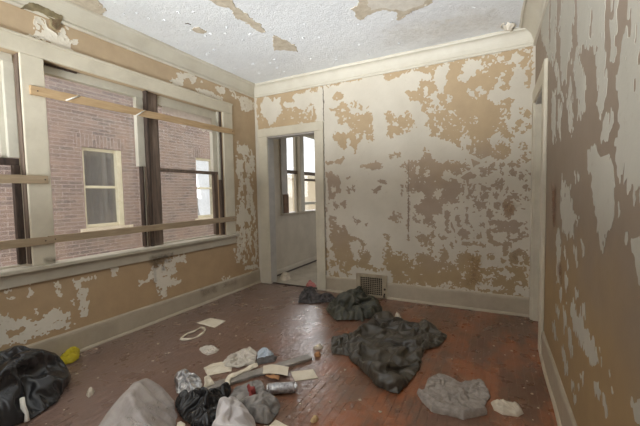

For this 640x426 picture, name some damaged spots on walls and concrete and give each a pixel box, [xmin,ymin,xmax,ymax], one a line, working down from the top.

peeling [20,2,78,51]
spalling [210,0,265,35]
spalling [272,35,298,52]
spalling [351,0,433,25]
peeling [541,0,640,254]
peeling [169,46,535,297]
peeling [0,275,97,348]
peeling [138,254,187,299]
peeling [552,170,602,405]
peeling [624,232,640,286]
peeling [594,381,613,419]
peeling [630,396,640,425]